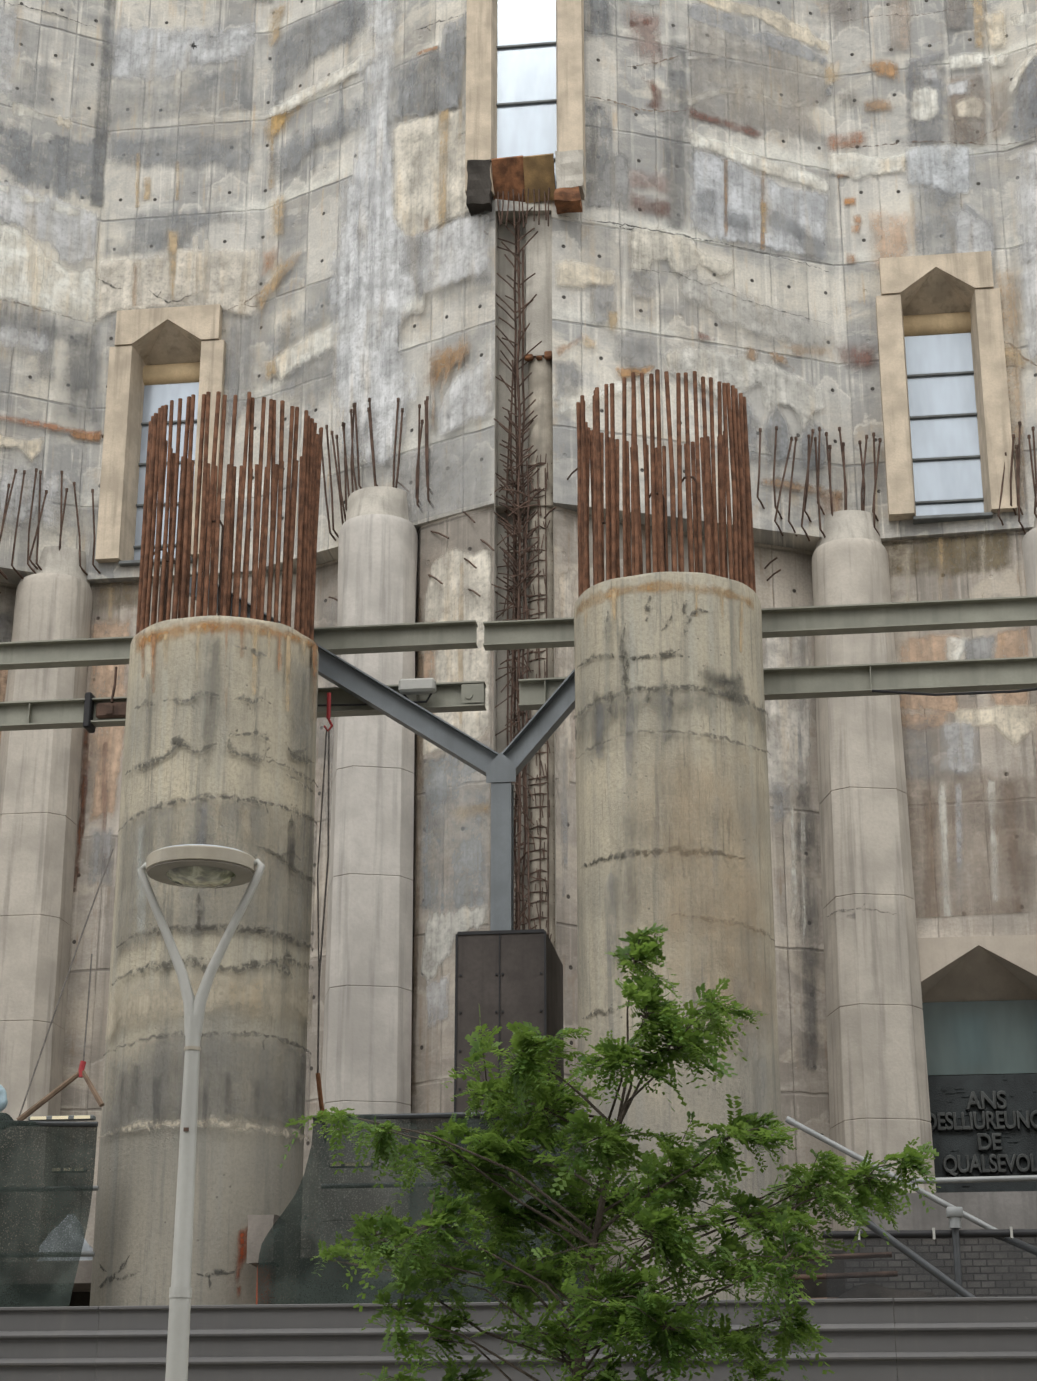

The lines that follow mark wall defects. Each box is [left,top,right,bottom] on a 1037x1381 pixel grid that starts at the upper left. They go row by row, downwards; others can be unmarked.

corrosion [690,109,759,136]
corrosion [2,417,101,441]
corrosion [139,623,318,709]
crack [573,596,771,764]
crack [119,692,318,884]
crack [584,846,745,867]
damp [907,746,1031,917]
crack [112,893,314,986]